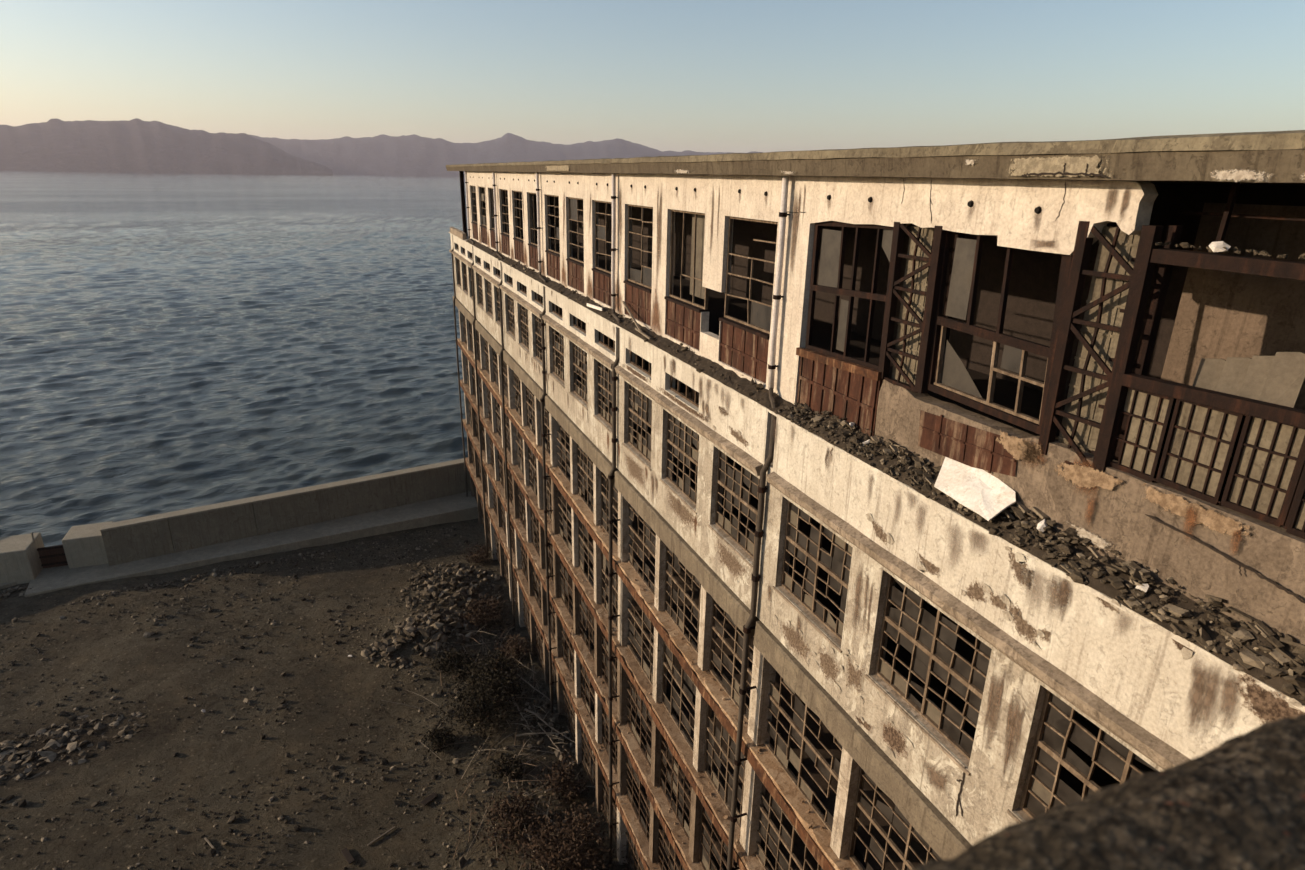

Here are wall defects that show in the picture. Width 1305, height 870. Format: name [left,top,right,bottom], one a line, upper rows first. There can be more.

spalling [1008,155,1111,178]
peeling [1210,169,1270,182]
spalling [996,429,1123,490]
leakage [449,249,1191,770]
spalling [1141,484,1250,537]
leakage [1190,666,1237,720]